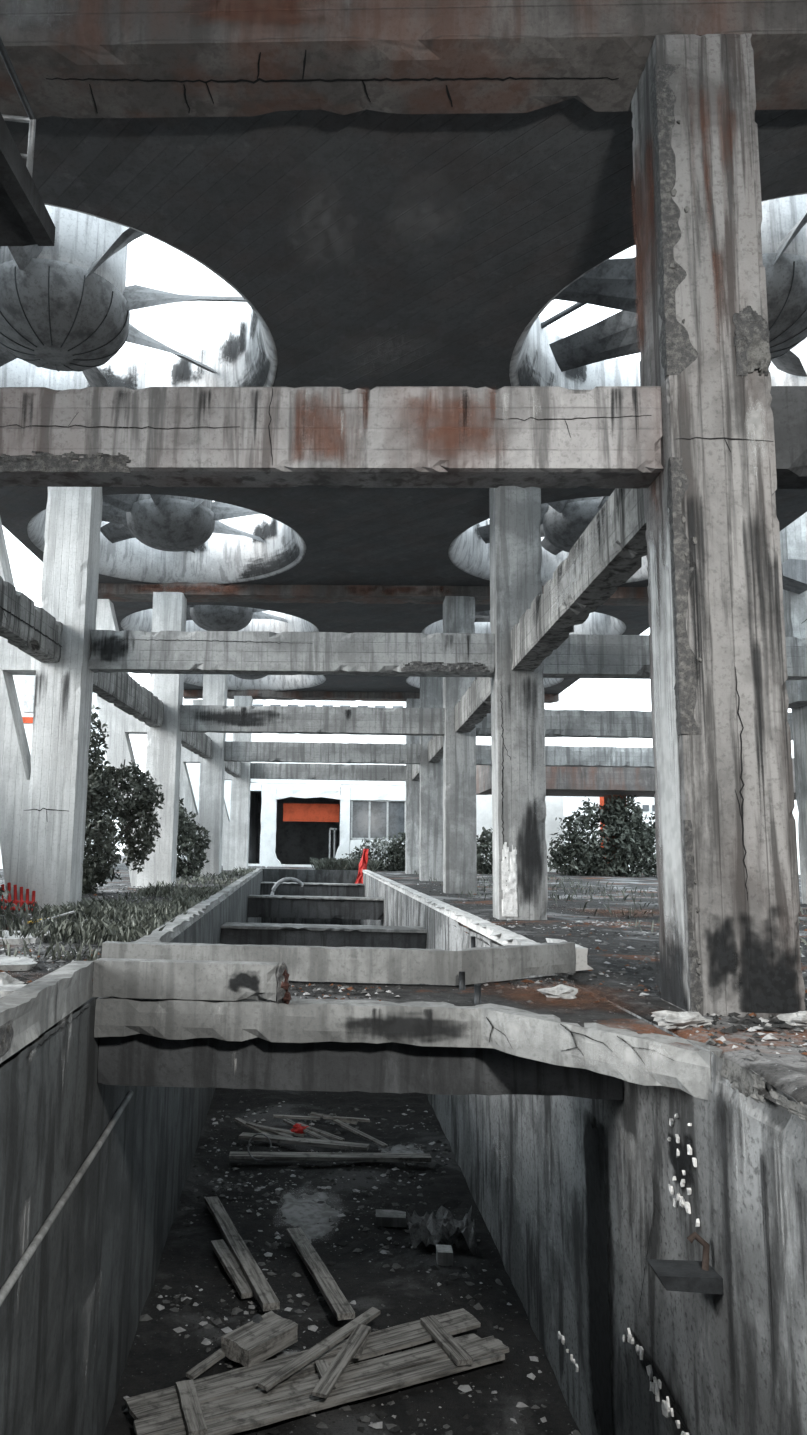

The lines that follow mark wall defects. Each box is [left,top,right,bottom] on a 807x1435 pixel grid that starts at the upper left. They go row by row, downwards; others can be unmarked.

spalling [650,64,698,377]
spalling [0,451,133,473]
damp [684,500,705,722]
damp [743,521,788,777]
damp [517,800,542,902]
damp [650,528,688,1011]
damp [707,908,801,1013]
spalling [104,1088,582,1435]
flaking render [667,1113,700,1227]
damp [716,1095,741,1320]
damp [760,1156,773,1350]
flaking render [622,1328,690,1435]